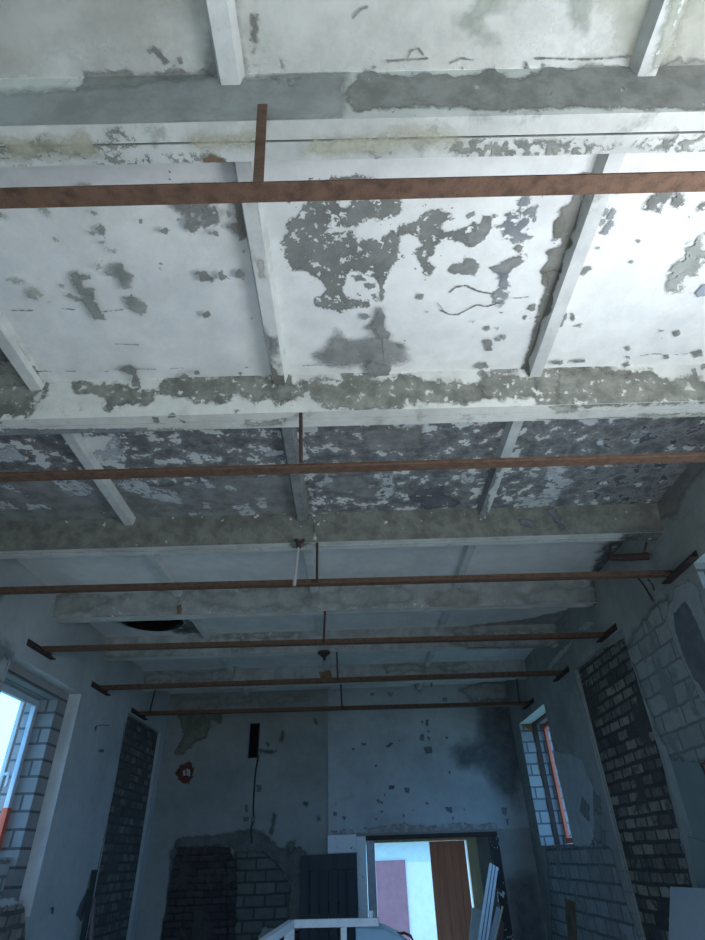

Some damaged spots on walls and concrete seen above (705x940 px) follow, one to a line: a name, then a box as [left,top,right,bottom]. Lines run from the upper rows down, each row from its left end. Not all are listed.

peeling [59,211,147,320]
crack [440,285,498,315]
peeling [52,480,94,497]
peeling [117,478,238,516]
peeling [231,497,268,516]
peeling [368,472,395,501]
peeling [513,466,574,508]
peeling [666,580,705,702]
leakage [174,695,310,755]
leakage [456,681,519,797]
flaking render [546,639,693,940]
flaking render [160,846,299,940]